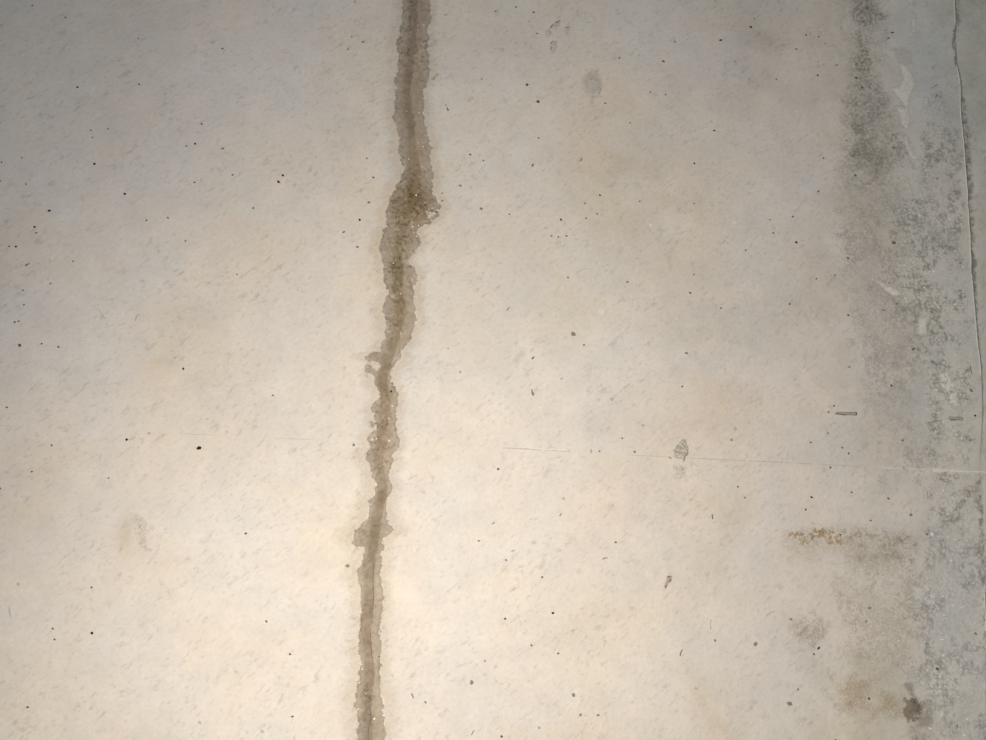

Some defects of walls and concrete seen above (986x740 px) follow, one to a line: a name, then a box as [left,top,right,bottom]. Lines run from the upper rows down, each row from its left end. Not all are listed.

water stain [346,0,445,740]